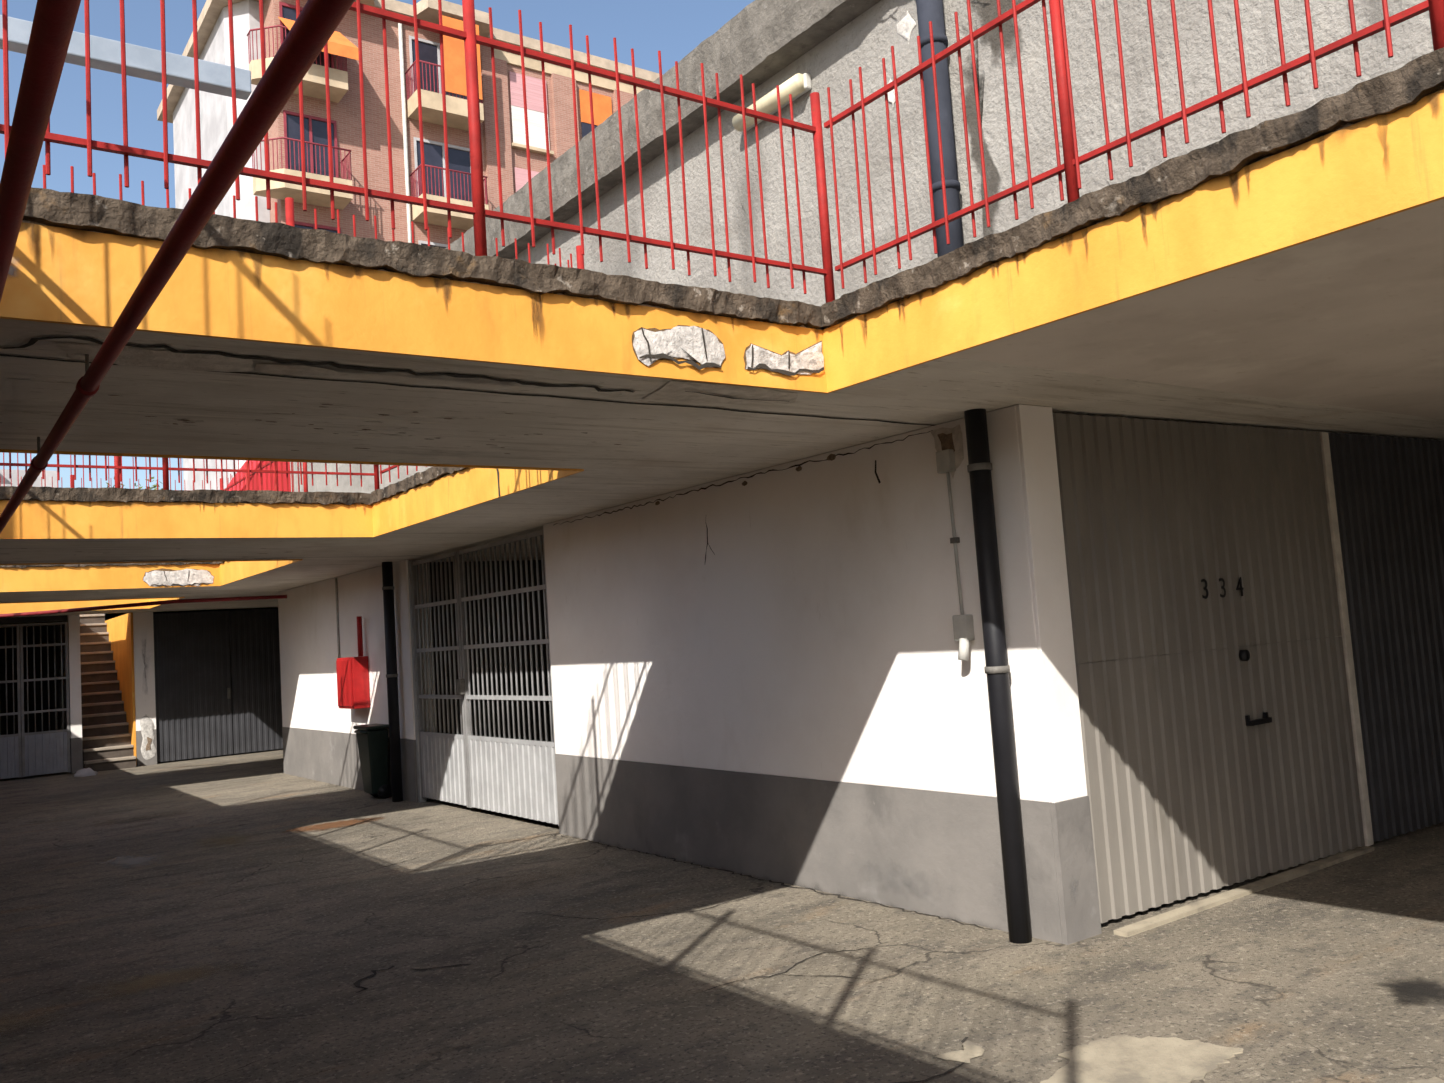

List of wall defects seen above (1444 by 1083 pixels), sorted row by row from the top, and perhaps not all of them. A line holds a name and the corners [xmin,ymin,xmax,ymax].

damp [970,0,1020,55]
damp [965,63,999,235]
crack [0,337,635,392]
peeling [632,325,824,404]